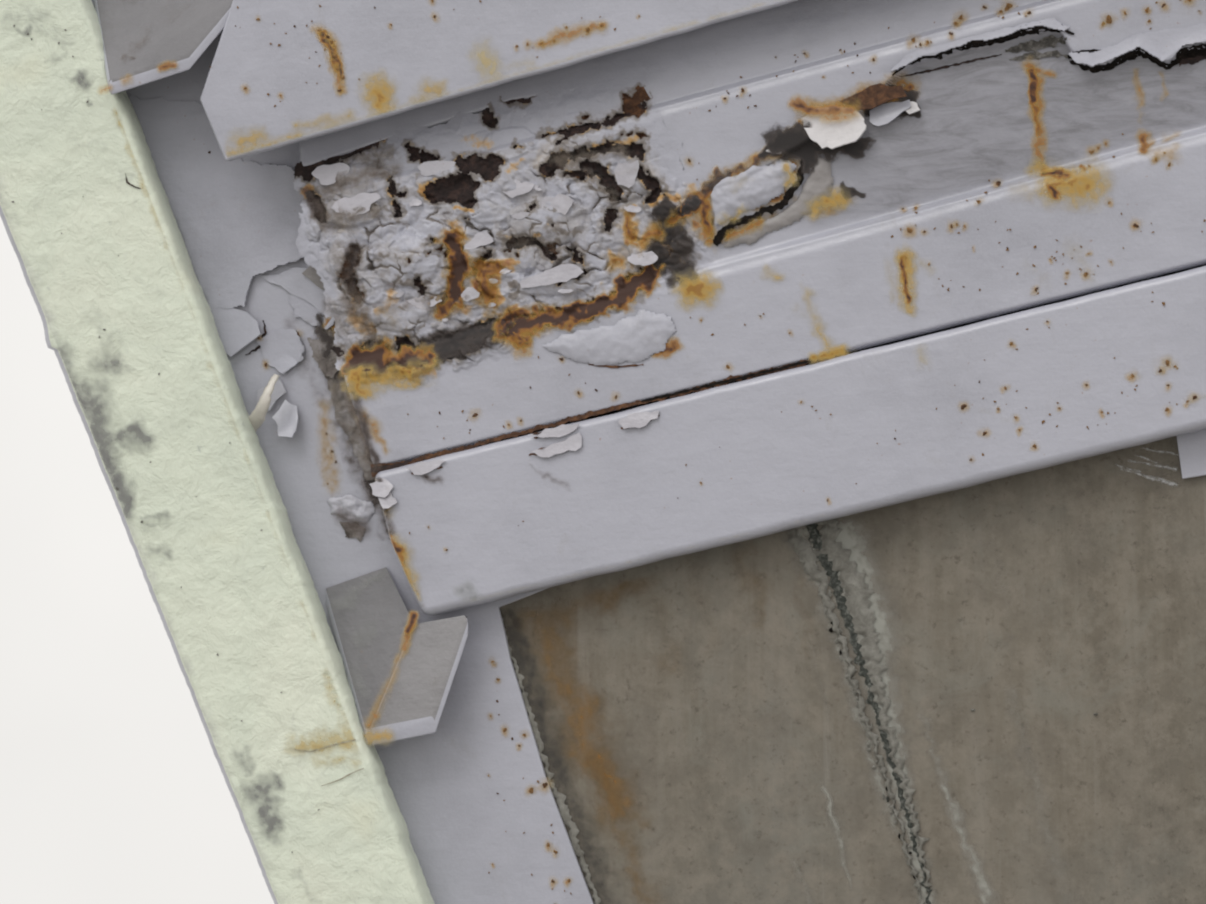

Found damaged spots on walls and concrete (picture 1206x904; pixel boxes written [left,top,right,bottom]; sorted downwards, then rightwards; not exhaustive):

corrosion [270,21,393,113]
corrosion [1024,63,1122,215]
corrosion [343,243,360,292]
peeling [127,75,716,388]
corrosion [434,228,664,359]
corrosion [624,146,797,248]
peeling [257,378,298,438]
corrosion [245,290,436,595]
peeling [408,460,446,481]
peeling [528,423,582,458]
peeling [618,411,660,429]
crack [787,519,933,904]